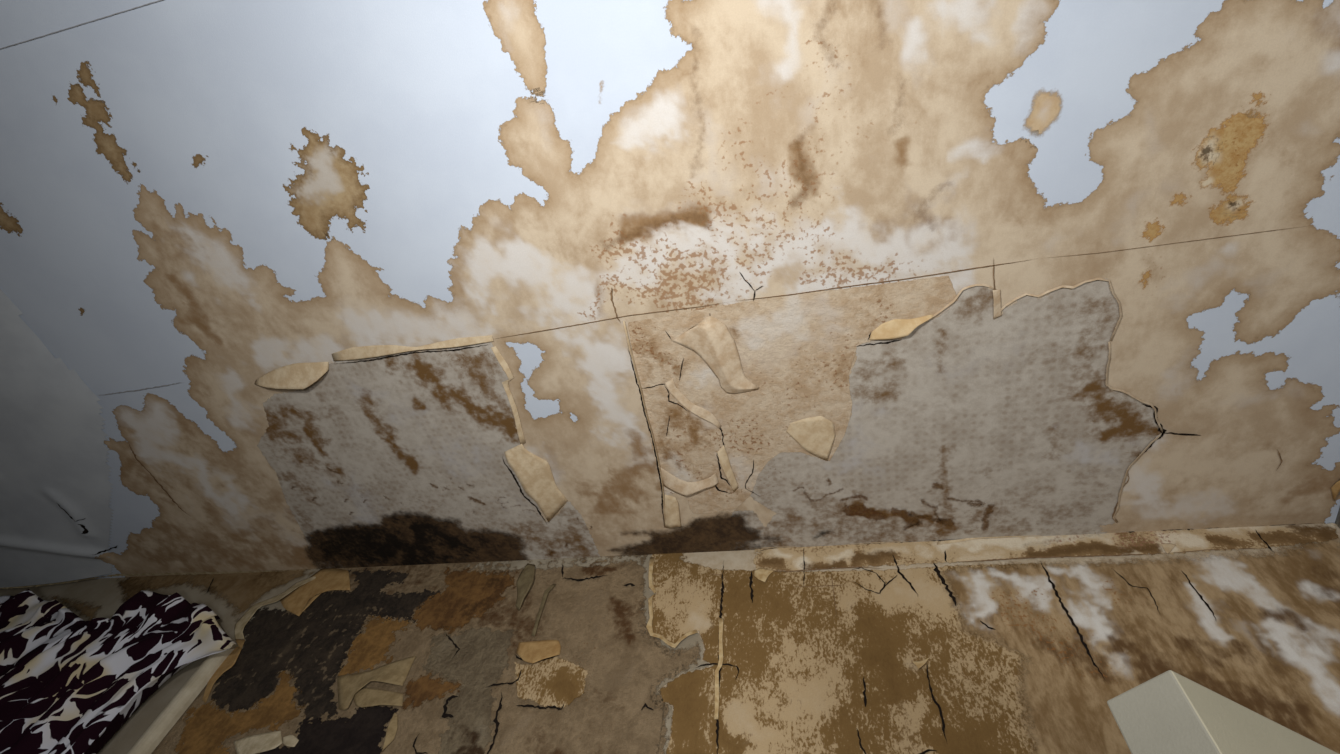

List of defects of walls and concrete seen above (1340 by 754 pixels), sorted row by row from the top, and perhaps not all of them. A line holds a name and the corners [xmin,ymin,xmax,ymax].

leakage [67,61,140,182]
leakage [0,202,24,237]
leakage [95,0,1340,615]
peeling [732,277,1163,550]
peeling [151,335,700,754]
leakage [413,567,517,634]
crack [695,545,825,754]
peeling [754,568,773,582]
crack [852,539,995,630]
leakage [612,492,1340,754]
crack [1041,563,1106,681]
crack [1181,570,1216,619]